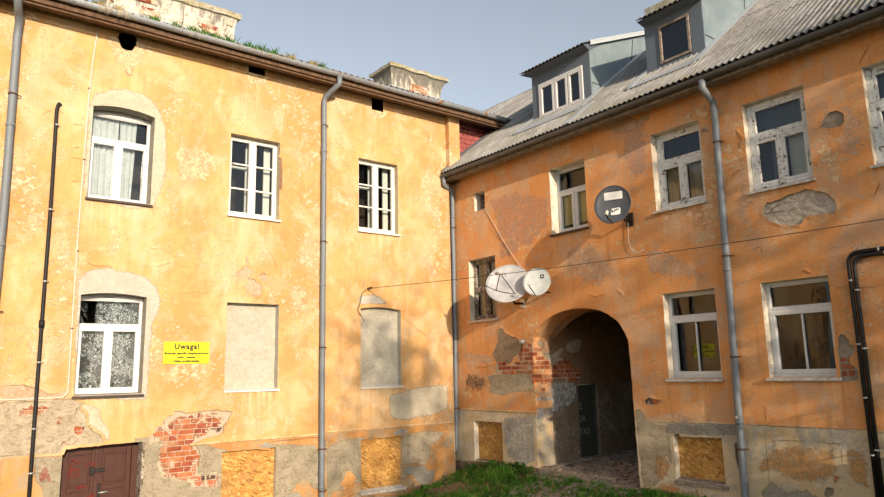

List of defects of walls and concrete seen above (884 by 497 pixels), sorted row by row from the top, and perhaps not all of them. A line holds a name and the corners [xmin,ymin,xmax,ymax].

spalling [817,107,849,132]
spalling [759,186,841,229]
spalling [488,326,581,396]
spalling [834,330,861,385]
flaking render [0,385,107,497]
spalling [135,406,235,497]
flaking render [272,438,405,497]
flaking render [403,431,445,465]
flaking render [636,395,672,487]